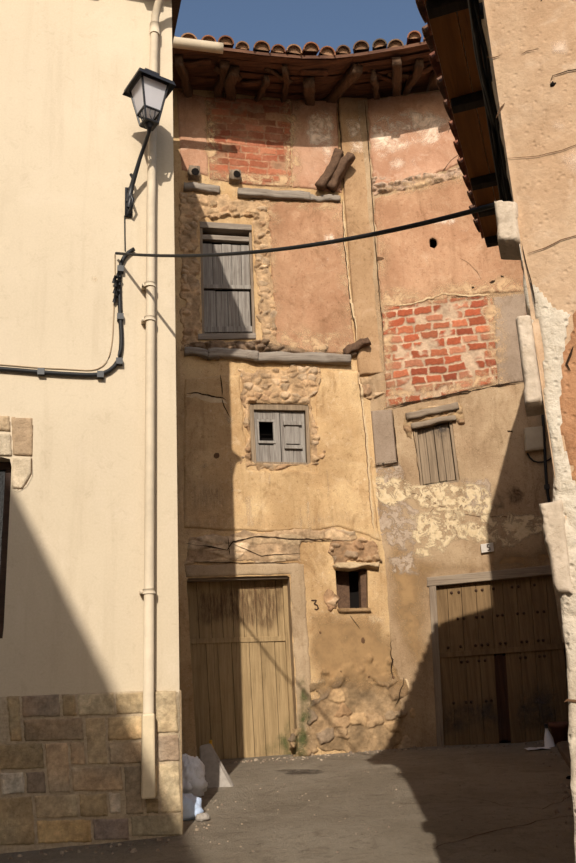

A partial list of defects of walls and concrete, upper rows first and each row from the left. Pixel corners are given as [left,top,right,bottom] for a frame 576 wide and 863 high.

crack [365,106,493,370]
crack [186,375,230,417]
flaking render [360,286,498,439]
peeling [559,311,576,481]
crack [187,536,350,564]
spalling [323,589,340,612]
peeling [184,462,543,574]